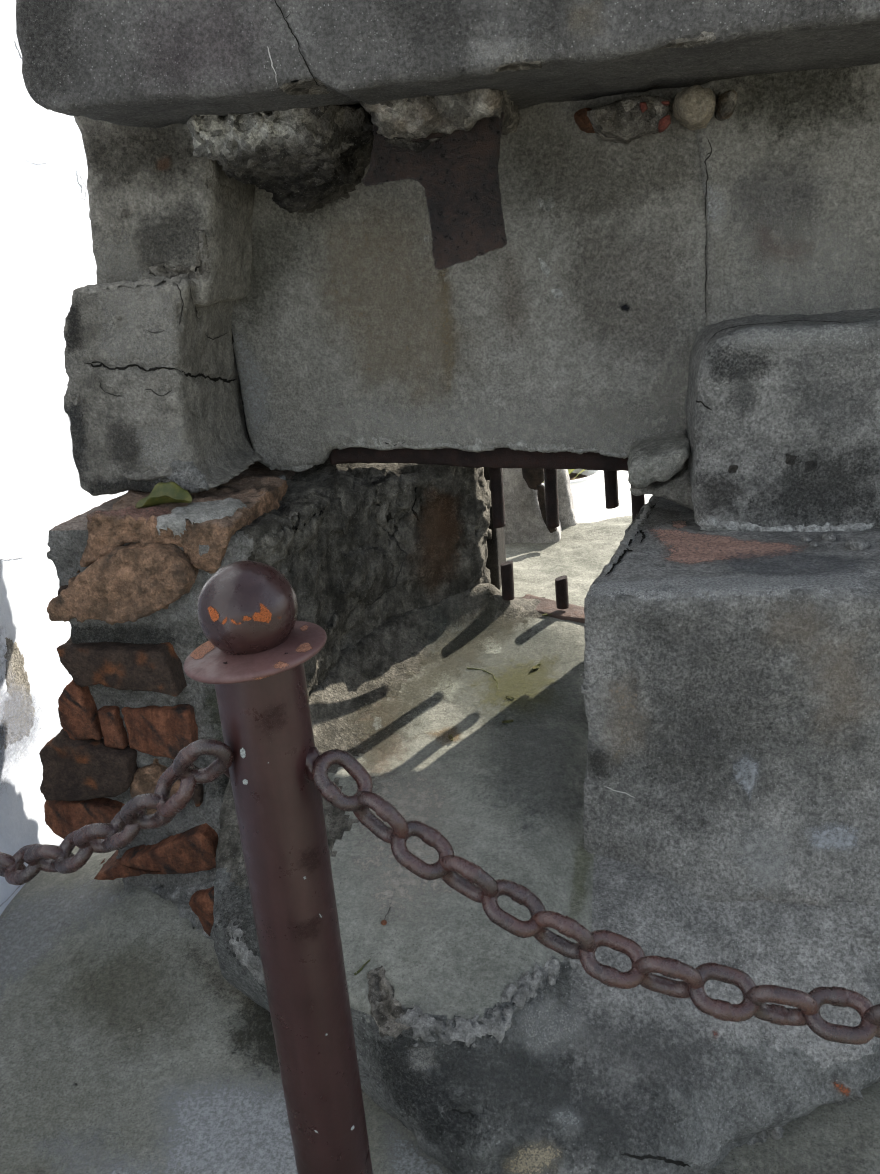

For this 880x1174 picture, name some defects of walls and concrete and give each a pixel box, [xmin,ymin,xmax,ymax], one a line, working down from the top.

crack [275,1,320,86]
spalling [187,78,522,214]
crack [704,138,863,342]
crack [147,266,211,333]
crack [86,329,259,463]
crack [606,504,656,575]
damp [0,680,38,775]
spalling [367,956,561,1048]
damp [503,1143,562,1174]